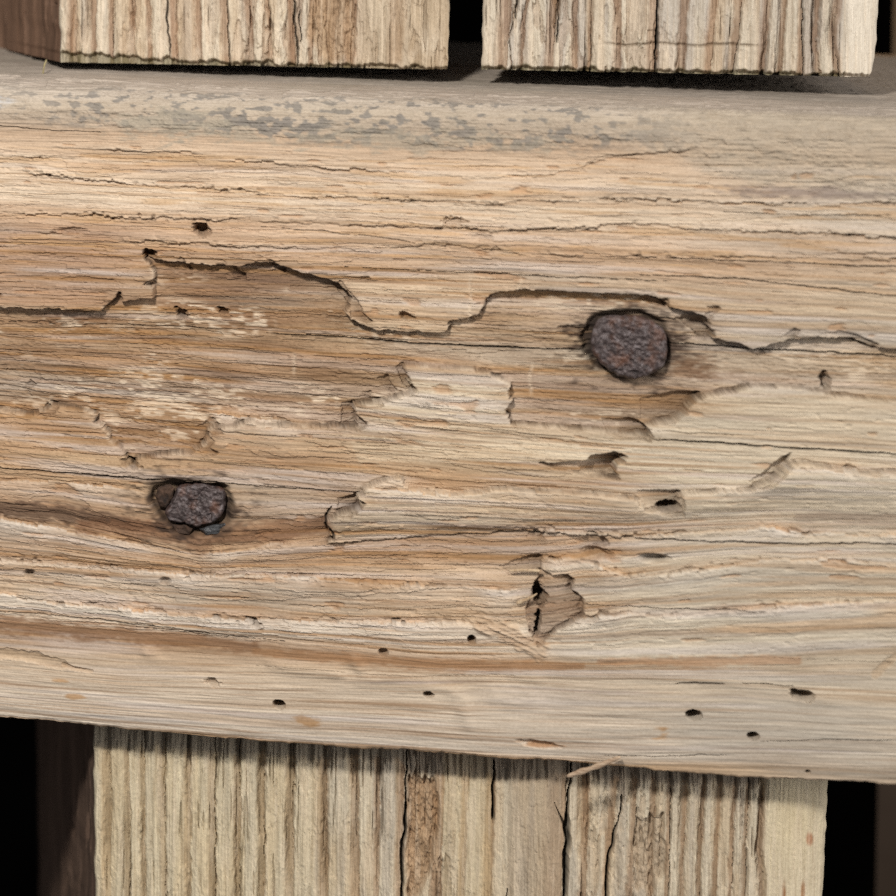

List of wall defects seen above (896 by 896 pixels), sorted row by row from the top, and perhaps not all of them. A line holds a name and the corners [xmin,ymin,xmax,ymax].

crack [622,421,896,456]
corrosion [93,456,278,569]
crack [400,749,408,896]
crack [554,761,573,896]